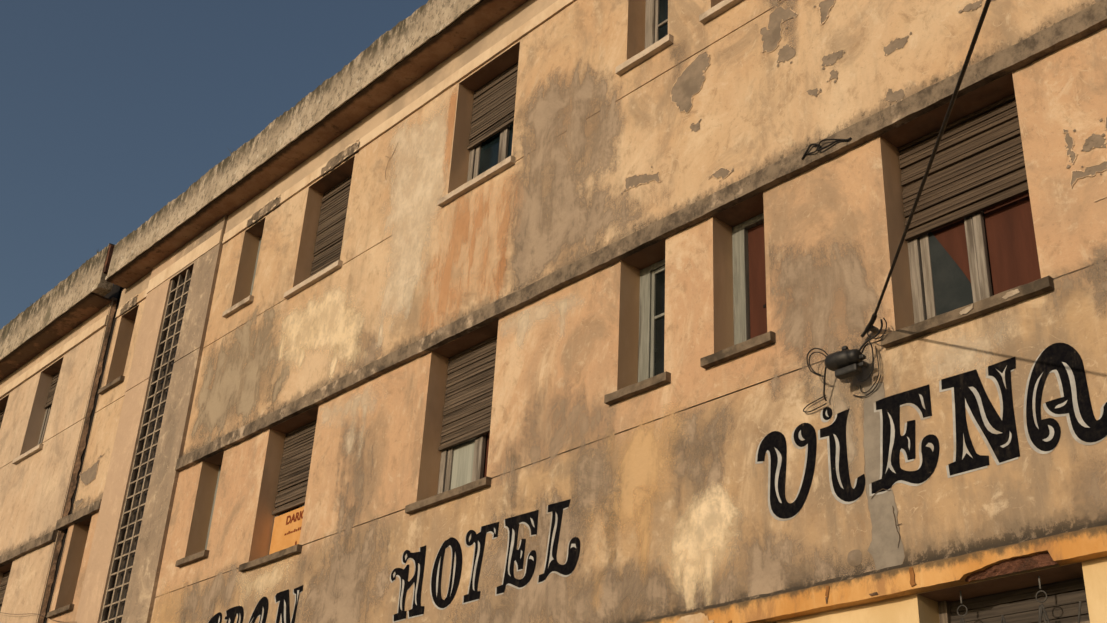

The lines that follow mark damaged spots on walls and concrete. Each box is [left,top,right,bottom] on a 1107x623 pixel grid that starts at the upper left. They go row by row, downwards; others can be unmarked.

peeling [670,51,711,132]
peeling [755,6,798,67]
peeling [814,0,835,25]
peeling [807,50,845,96]
peeling [884,32,912,56]
damp [504,62,642,289]
peeling [621,166,661,195]
peeling [1063,116,1107,188]
damp [769,242,882,465]
damp [452,399,875,623]
spalling [965,552,1059,582]
peeling [675,613,714,623]